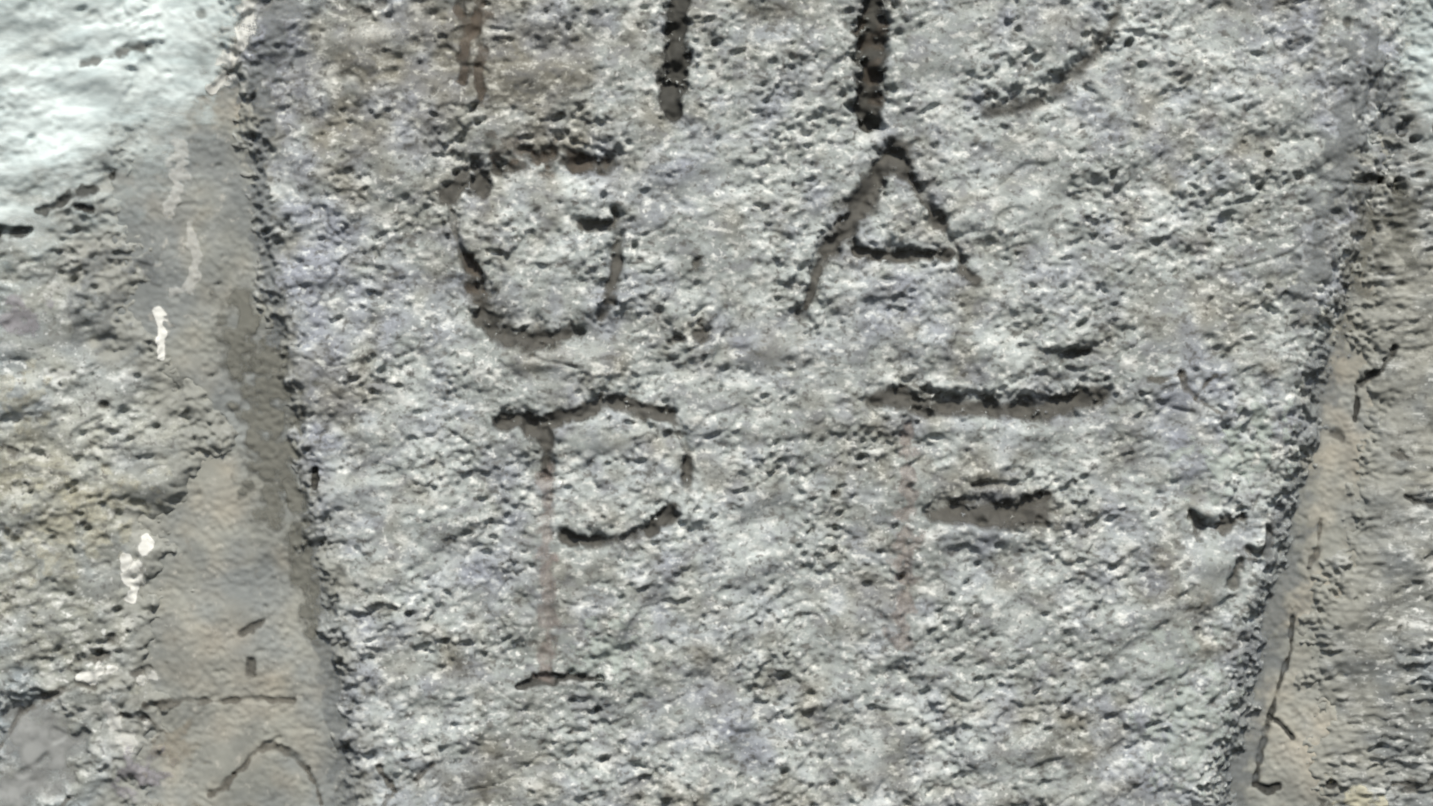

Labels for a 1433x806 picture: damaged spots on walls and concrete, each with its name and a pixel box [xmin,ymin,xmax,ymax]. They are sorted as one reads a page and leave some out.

crack [1252,616,1295,795]